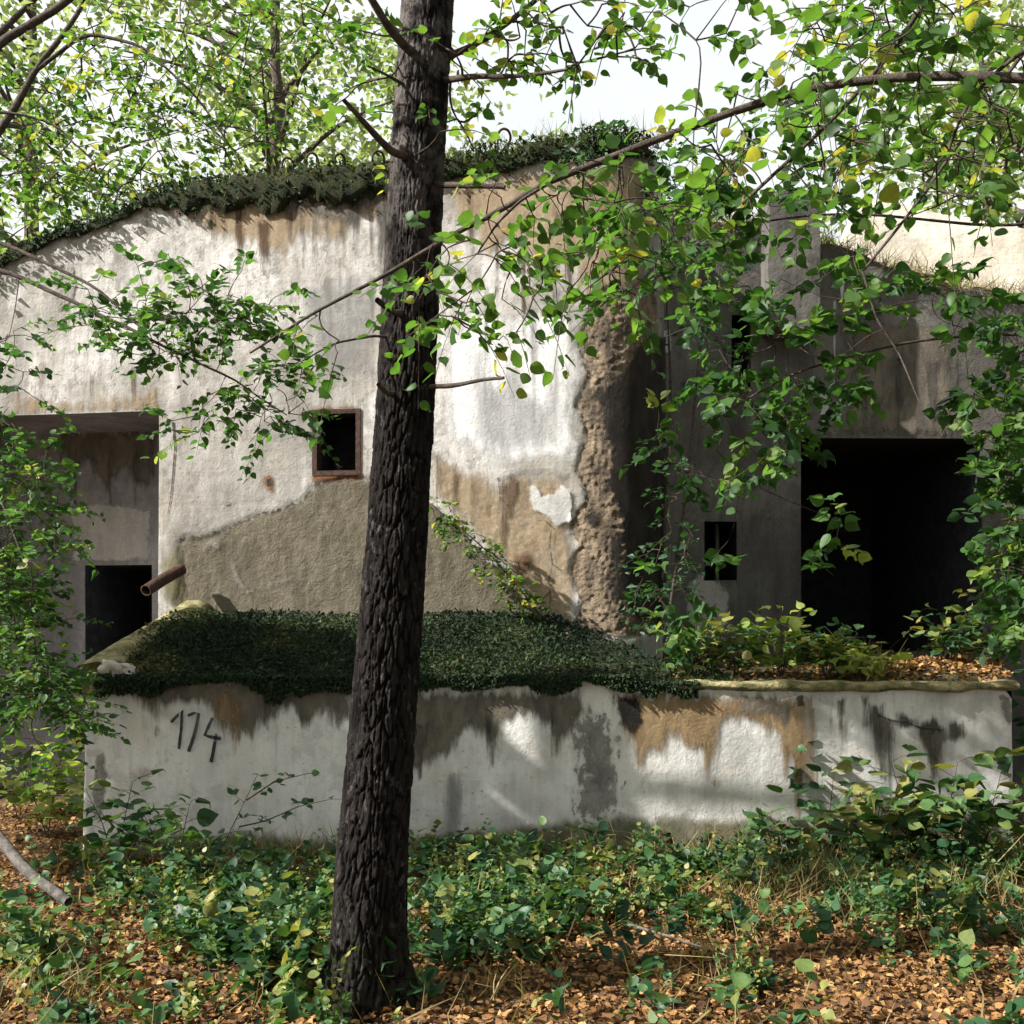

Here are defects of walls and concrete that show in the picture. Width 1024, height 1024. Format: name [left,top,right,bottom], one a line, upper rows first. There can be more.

leakage [174,192,386,274]
corrosion [263,474,273,491]
spalling [424,267,663,637]
peeling [177,478,370,620]
leakage [132,682,351,738]
leakage [413,691,590,779]
leakage [613,692,814,805]
leakage [862,697,964,783]